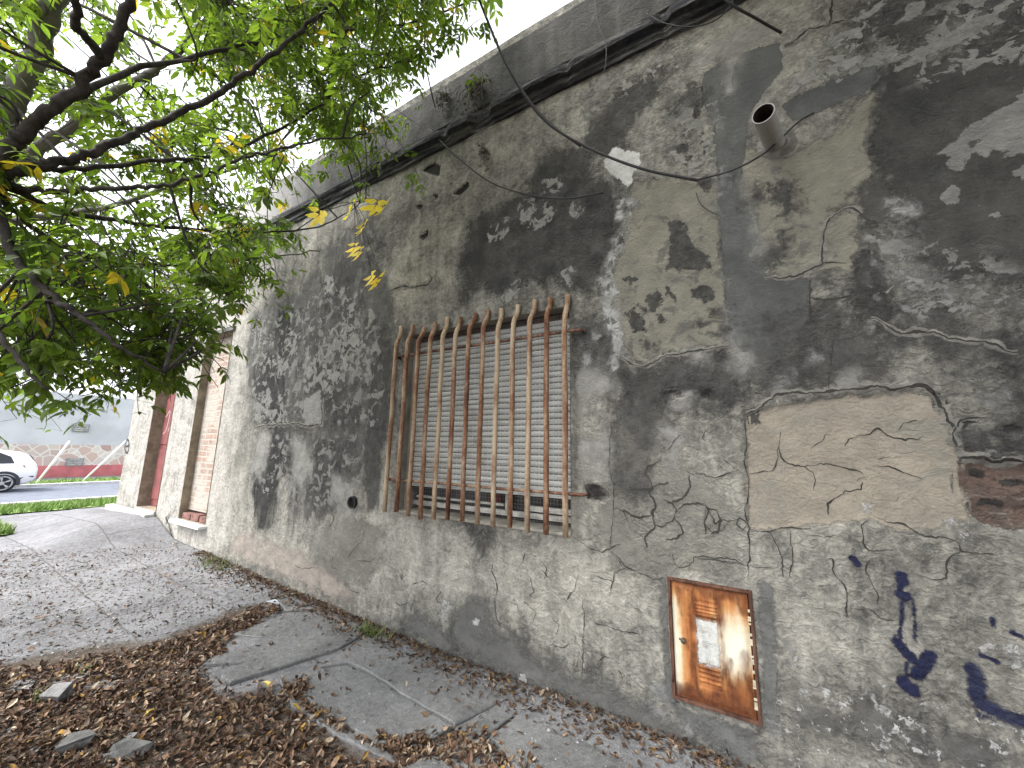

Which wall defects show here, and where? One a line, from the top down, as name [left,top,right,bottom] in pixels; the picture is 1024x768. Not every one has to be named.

peeling [786,0,1024,97]
peeling [486,177,585,243]
damp [457,64,673,304]
peeling [597,146,642,298]
damp [572,0,1024,503]
crack [762,205,863,321]
peeling [936,87,1024,182]
peeling [249,275,385,512]
crack [491,317,1024,684]
spalling [940,445,1024,542]
rust [691,585,748,627]
rust [676,645,757,718]